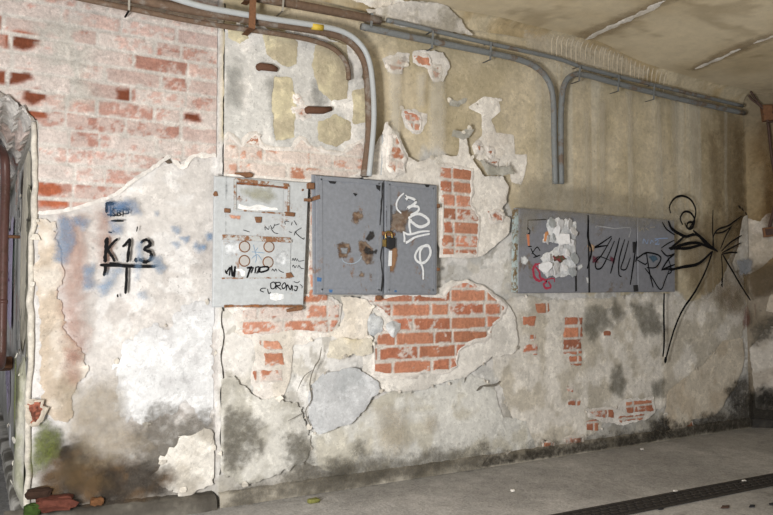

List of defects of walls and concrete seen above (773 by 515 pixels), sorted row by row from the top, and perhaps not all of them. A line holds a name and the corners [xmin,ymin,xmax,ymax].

crack [220,3,228,176]
flaking render [0,0,217,427]
flaking render [111,22,773,496]
crack [218,307,226,403]
damp [585,303,620,338]
damp [612,367,624,395]
damp [632,306,661,333]
damp [39,410,212,506]
damp [224,413,262,467]
damp [232,379,773,505]